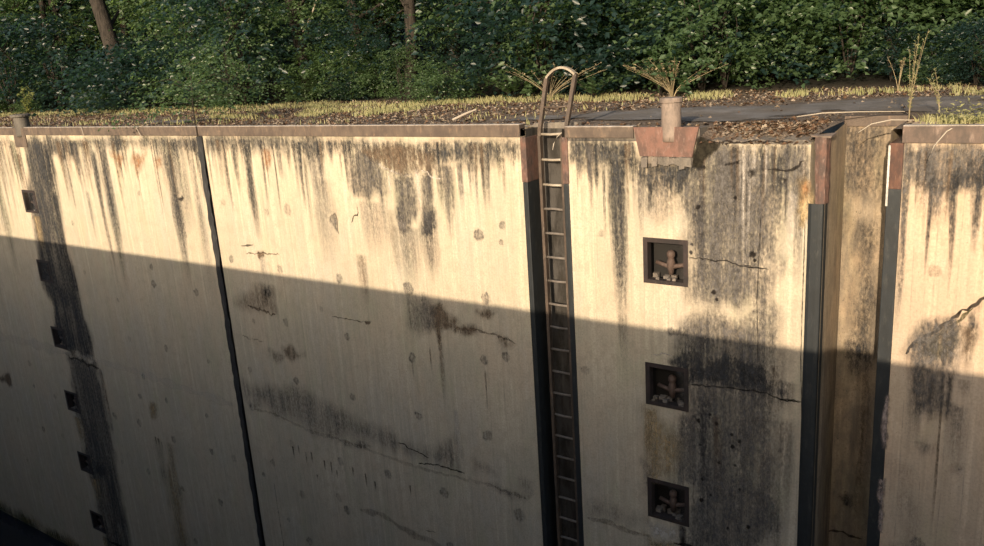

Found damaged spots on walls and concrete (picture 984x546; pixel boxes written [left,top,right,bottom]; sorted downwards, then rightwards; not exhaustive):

leakage [141,136,518,260]
leakage [840,123,882,189]
leakage [898,143,984,292]
leakage [1,135,129,546]
crack [398,442,465,474]
leakage [570,138,809,546]
crack [690,219,805,408]
leakage [848,279,875,373]
leakage [909,318,973,484]
crack [906,297,984,357]
crack [674,528,692,546]